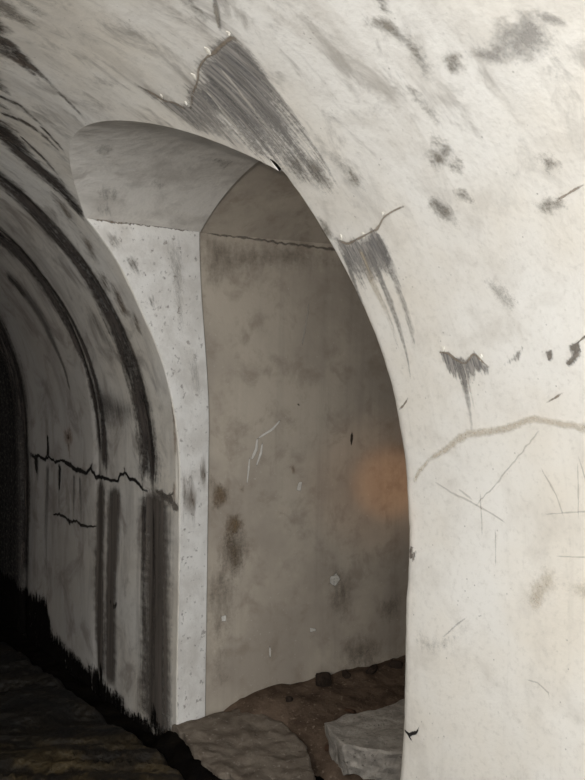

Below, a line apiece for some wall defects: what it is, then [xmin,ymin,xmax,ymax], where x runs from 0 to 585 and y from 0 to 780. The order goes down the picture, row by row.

water stain [0,1,30,23]
water stain [0,22,47,80]
water stain [0,85,83,217]
water stain [0,173,171,741]
crack [30,436,147,491]
crack [53,512,96,528]